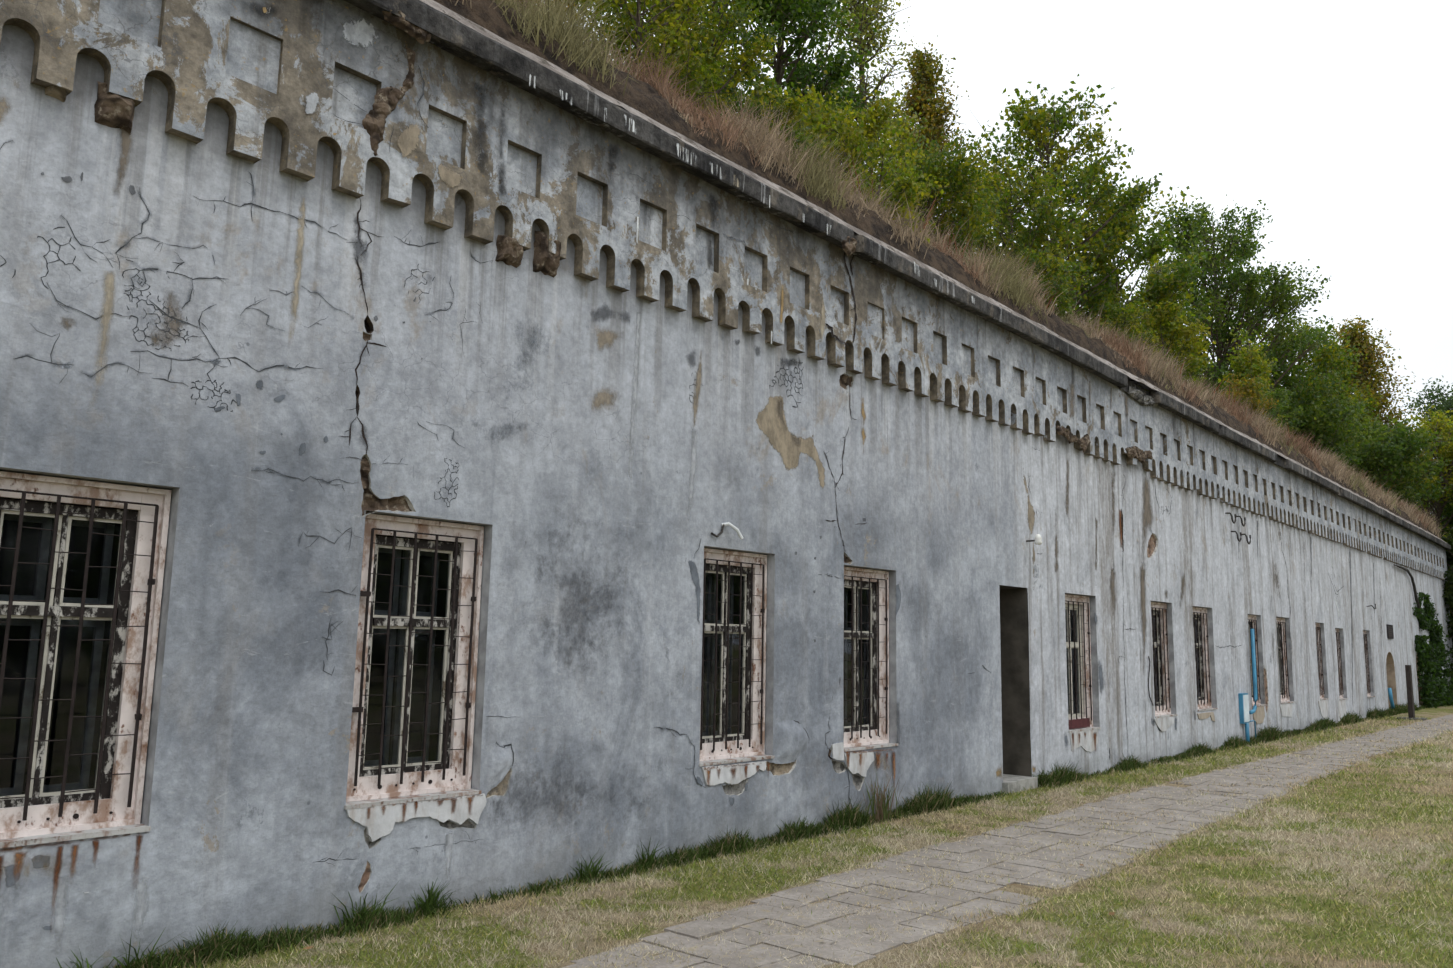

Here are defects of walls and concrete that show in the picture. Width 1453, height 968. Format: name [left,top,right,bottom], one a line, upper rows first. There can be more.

spalling [45,86,67,102]
spalling [94,81,135,134]
spalling [343,10,431,158]
spalling [495,231,561,278]
crack [0,173,493,507]
peeling [756,396,825,488]
crack [298,527,361,552]
crack [320,586,357,675]
peeling [697,759,797,805]
peeling [828,742,875,791]
peeling [346,768,512,893]
corrosion [0,834,142,889]